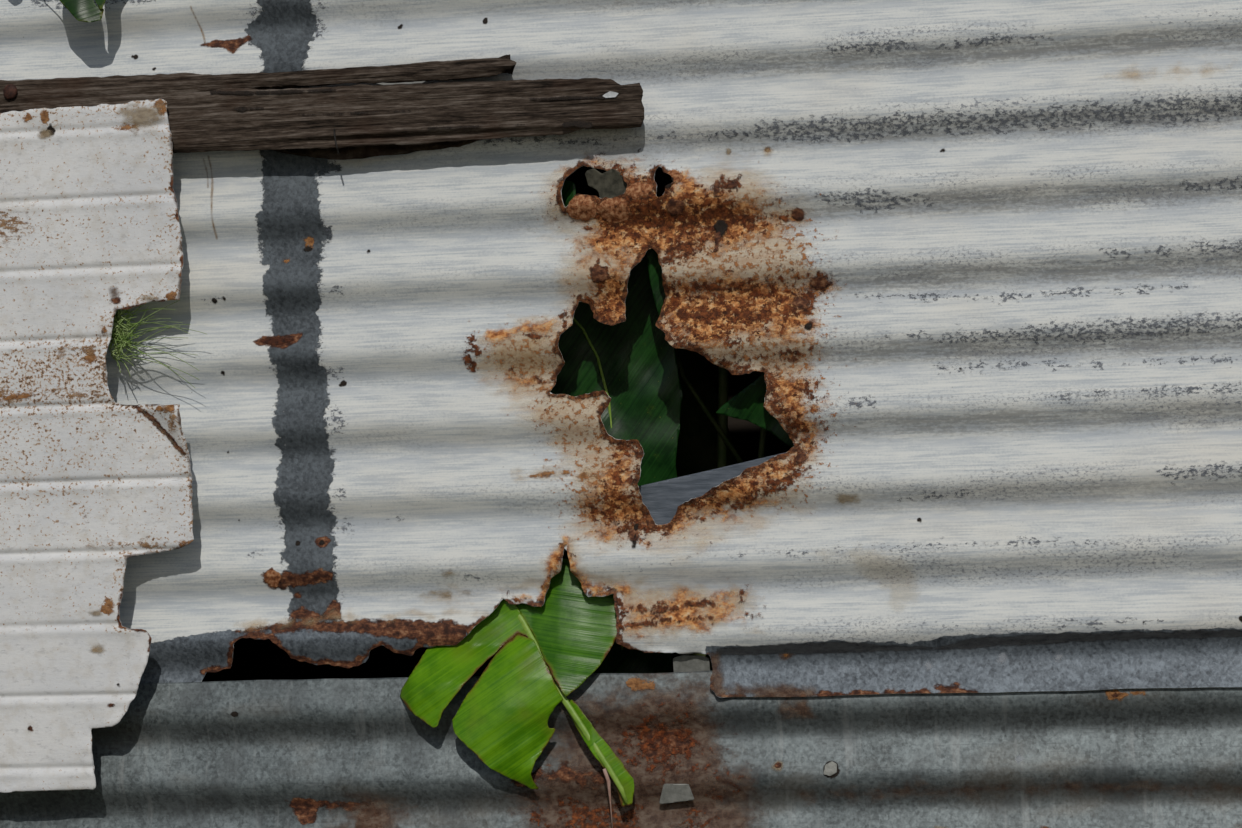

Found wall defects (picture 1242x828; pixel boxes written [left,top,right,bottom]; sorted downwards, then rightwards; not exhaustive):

rust [191,8,252,54]
rust [0,209,30,242]
rust [0,388,105,402]
rust [200,149,856,675]
rust [511,653,978,828]